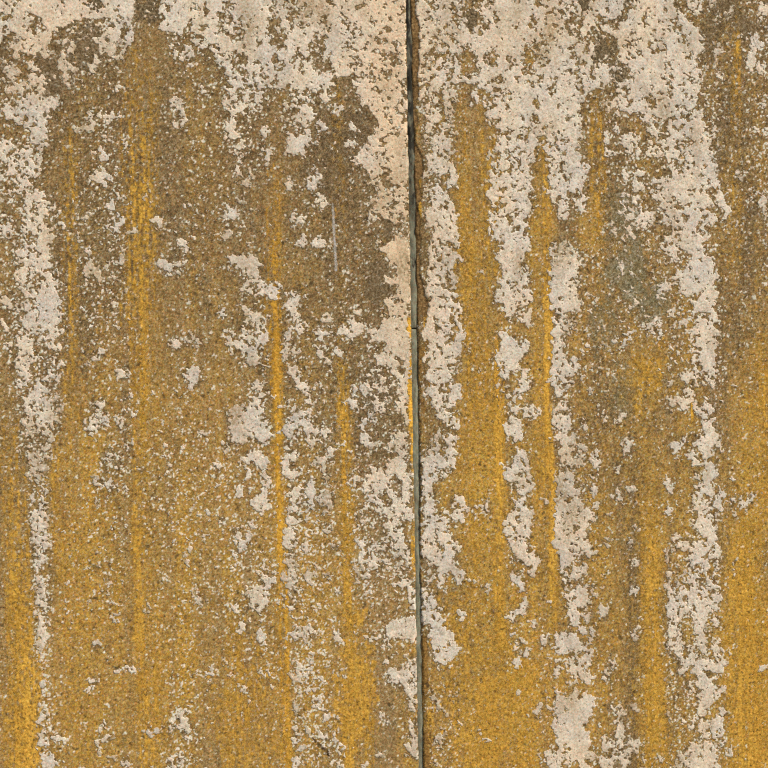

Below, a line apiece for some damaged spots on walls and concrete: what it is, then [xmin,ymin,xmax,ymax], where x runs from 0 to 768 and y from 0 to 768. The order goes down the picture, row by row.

water stain [0,37,23,84]
water stain [35,0,128,104]
water stain [133,0,165,24]
water stain [463,0,478,34]
water stain [592,33,627,90]
water stain [700,0,766,60]
water stain [308,105,374,207]
water stain [376,209,394,238]
water stain [365,257,394,312]
water stain [601,234,668,323]
water stain [361,365,391,418]